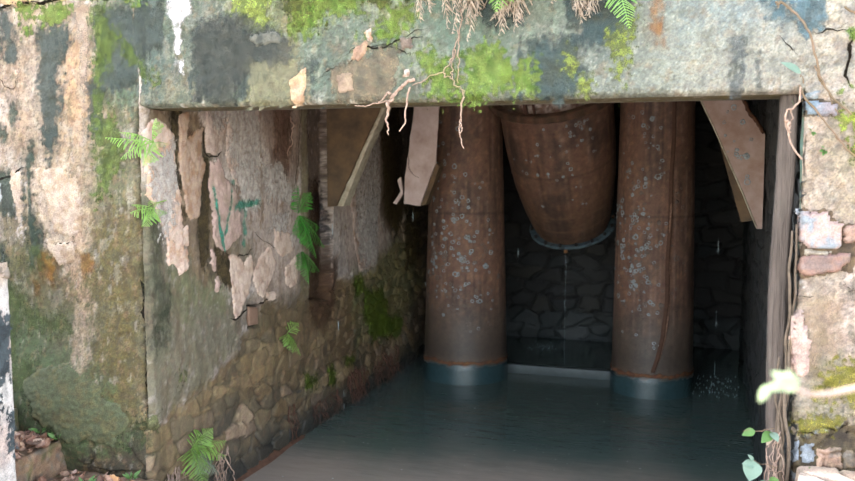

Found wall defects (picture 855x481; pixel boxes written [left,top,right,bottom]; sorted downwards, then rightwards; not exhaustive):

crack [0,0,59,9]
leakage [233,56,267,107]
leakage [307,58,328,98]
crack [322,28,430,77]
crack [815,22,853,87]
leakage [0,0,232,266]
flaking render [138,11,306,319]
flaking render [0,169,24,229]
flaking render [33,167,85,266]
flaking render [795,207,855,279]
leakage [0,309,20,459]